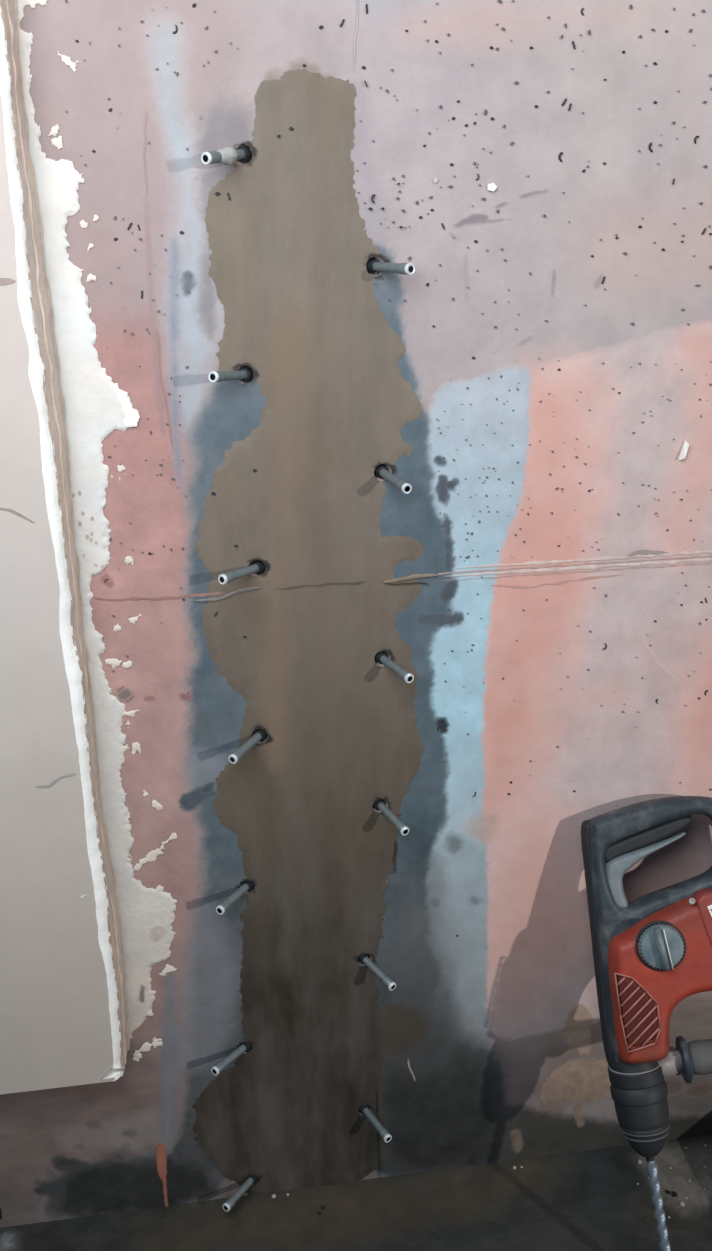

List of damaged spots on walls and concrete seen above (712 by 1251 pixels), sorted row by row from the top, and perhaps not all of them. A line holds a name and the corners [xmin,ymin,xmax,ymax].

peeling [29,0,47,8]
peeling [58,51,79,72]
peeling [48,124,63,149]
damp [353,96,363,156]
peeling [109,381,140,427]
crack [96,550,712,602]
peeling [104,658,132,669]
spalling [116,686,154,728]
peeling [121,742,141,755]
peeling [133,833,177,871]
peeling [133,1037,163,1061]
corrosion [156,1144,168,1207]